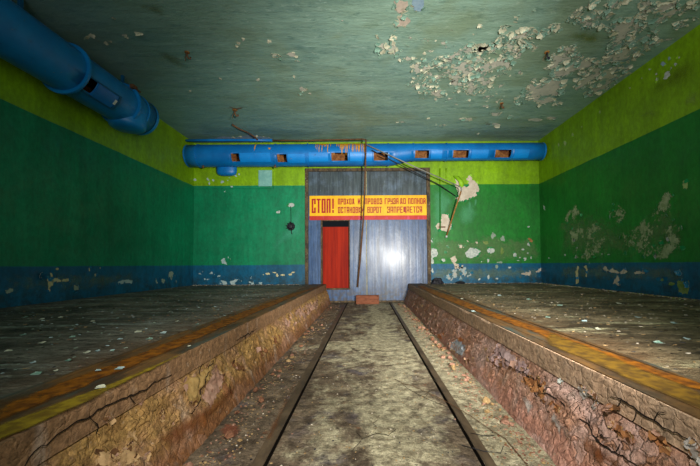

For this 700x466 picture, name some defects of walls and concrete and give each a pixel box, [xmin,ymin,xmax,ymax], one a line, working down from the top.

peeling [375,0,700,128]
corrosion [315,143,365,152]
peeling [453,174,479,203]
peeling [431,213,498,281]
flaking render [458,232,511,269]
peeling [565,206,610,284]
peeling [601,266,649,286]
peeling [619,193,686,260]
crack [499,352,565,406]
crack [24,374,172,466]
crack [579,418,637,466]
crack [611,396,688,439]